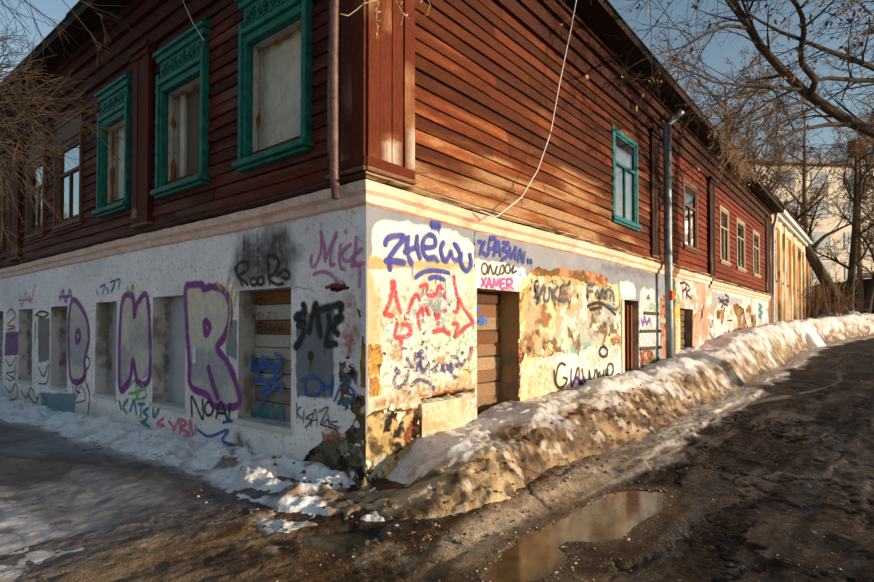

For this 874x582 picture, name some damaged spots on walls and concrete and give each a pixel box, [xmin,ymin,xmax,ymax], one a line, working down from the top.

spalling [337,288,475,486]
peeling [518,266,622,397]
spalling [716,303,756,330]